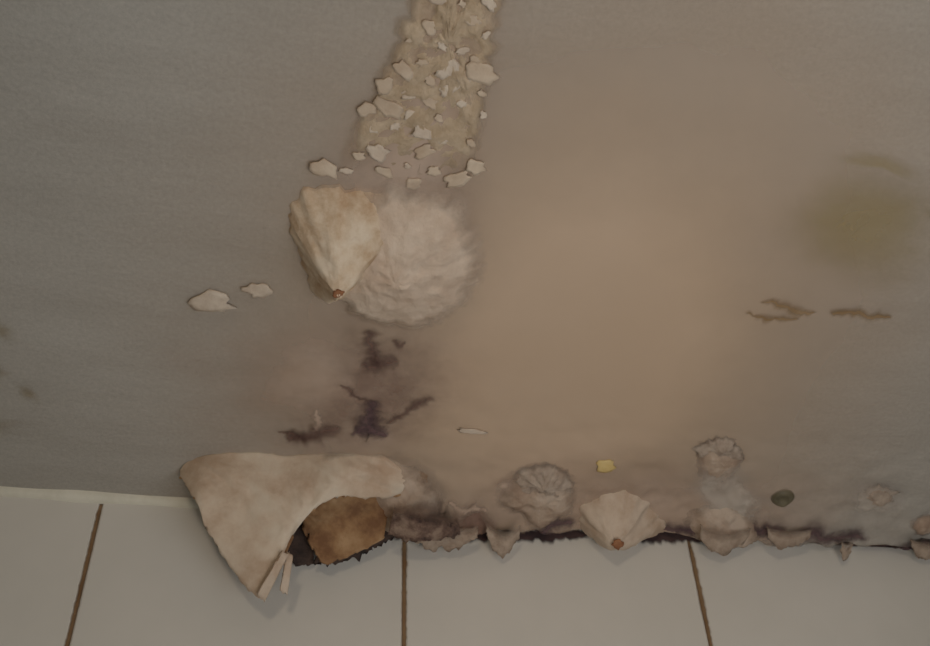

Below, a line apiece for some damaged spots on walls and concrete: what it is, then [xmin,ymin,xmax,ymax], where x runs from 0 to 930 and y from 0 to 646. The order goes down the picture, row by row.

peeling [309,0,501,198]
peeling [188,289,237,313]
peeling [241,283,273,299]
damp [269,74,832,543]
flaking render [179,452,428,602]
peeling [767,526,812,550]
damp [754,525,930,550]